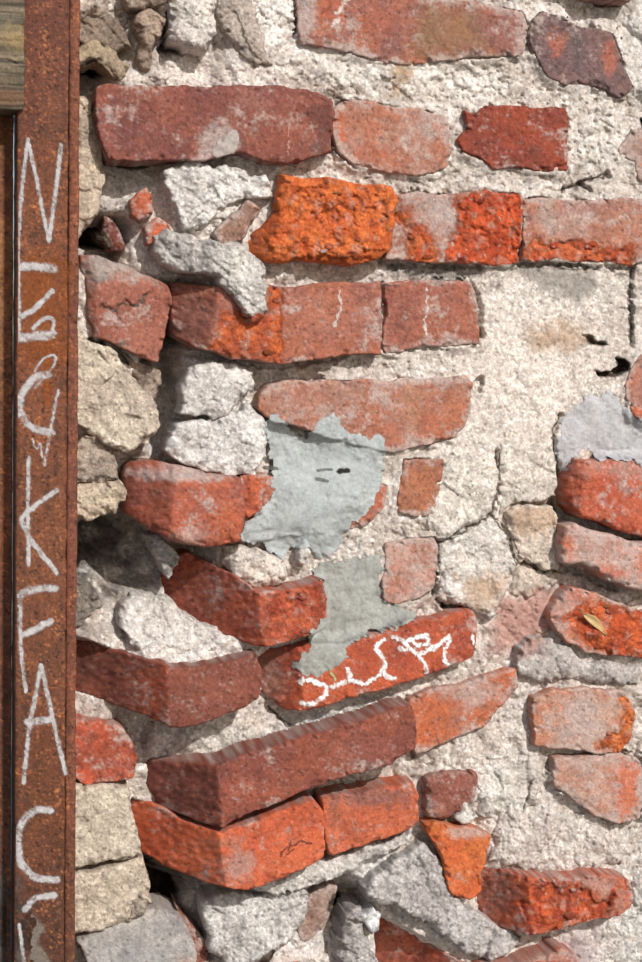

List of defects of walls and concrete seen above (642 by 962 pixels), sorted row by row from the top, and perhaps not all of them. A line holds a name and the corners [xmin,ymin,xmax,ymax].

spalling [209,287,284,363]
crack [431,452,556,614]